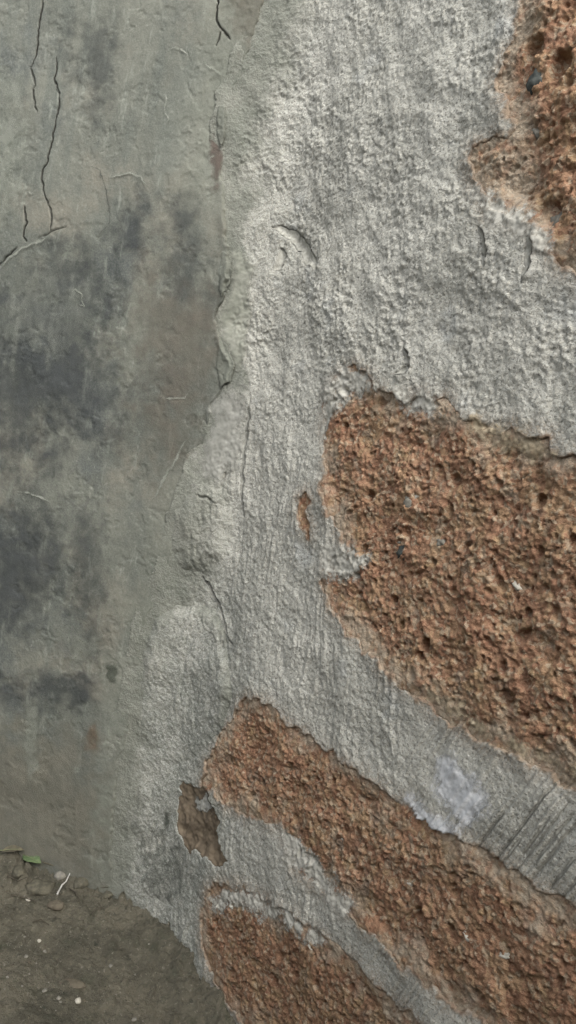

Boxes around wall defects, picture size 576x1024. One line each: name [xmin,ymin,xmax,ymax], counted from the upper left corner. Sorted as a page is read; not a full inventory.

crack [216,1,230,45]
crack [0,0,67,265]
spalling [478,227,486,266]
spalling [521,236,532,282]
damp [0,263,110,428]
spalling [298,492,311,539]
spalling [177,781,227,867]
damp [405,756,489,834]